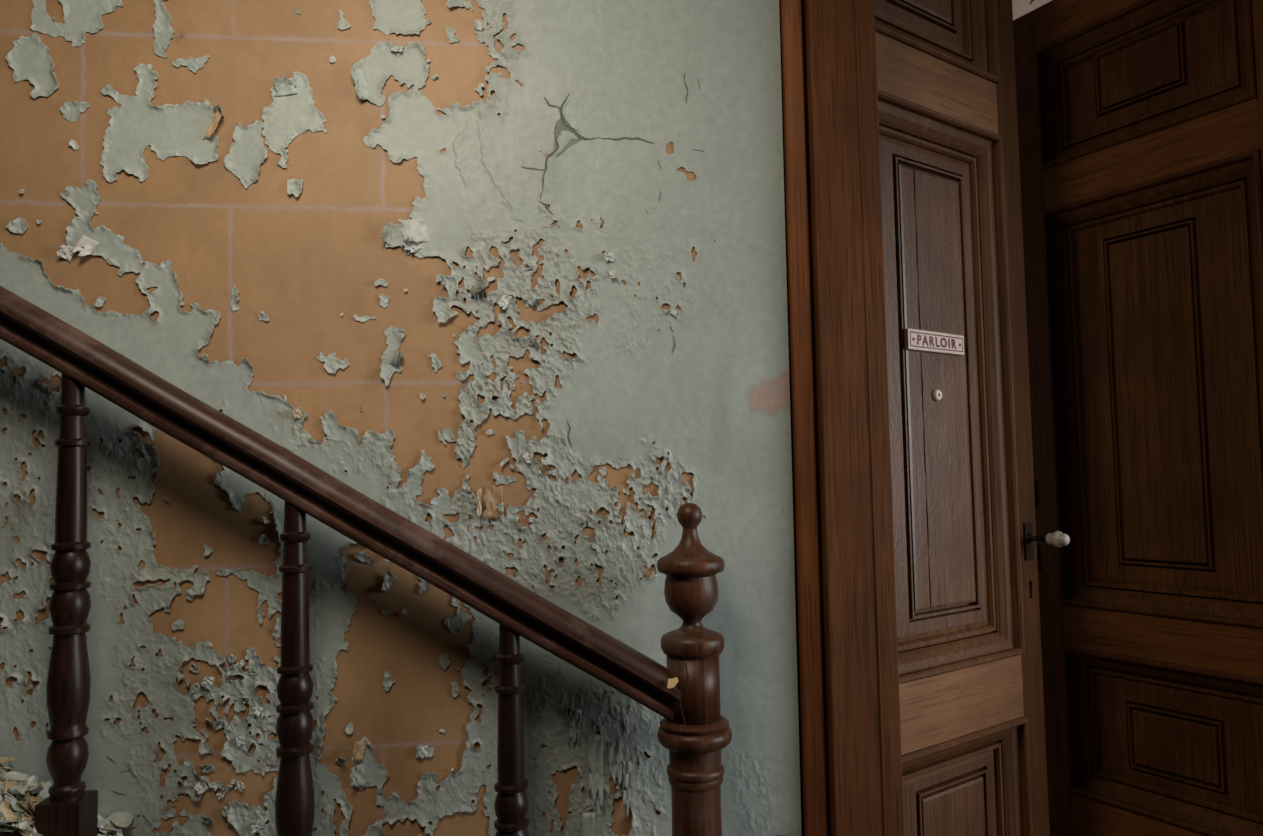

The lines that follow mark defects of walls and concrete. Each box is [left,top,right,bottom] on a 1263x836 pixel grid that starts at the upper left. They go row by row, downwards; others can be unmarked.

crack [522,93,662,215]
peeling [0,0,696,630]
peeling [0,662,39,703]
peeling [13,721,49,741]
peeling [98,426,282,836]
peeling [314,543,495,836]
peeling [542,708,651,836]